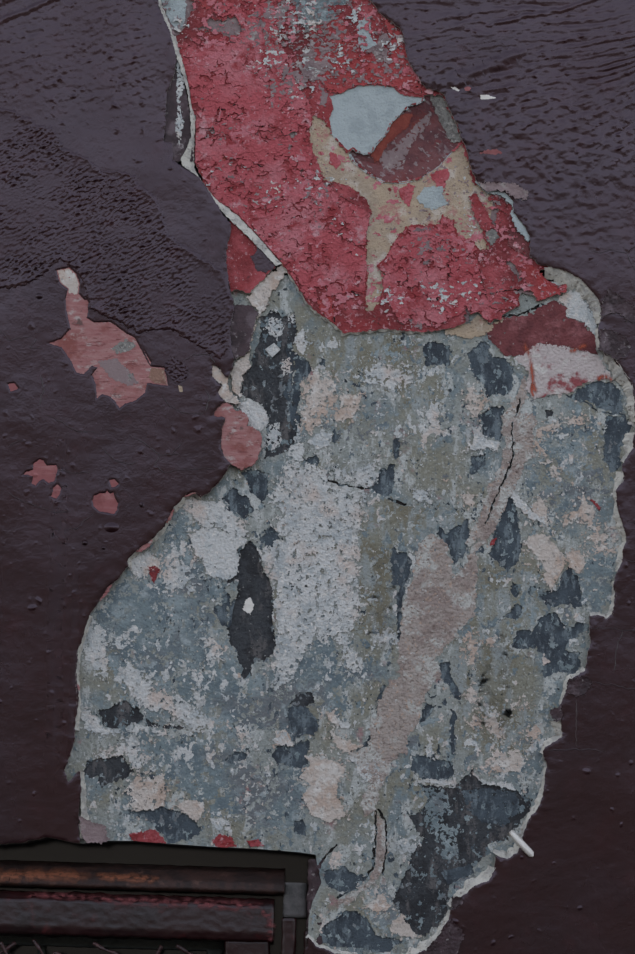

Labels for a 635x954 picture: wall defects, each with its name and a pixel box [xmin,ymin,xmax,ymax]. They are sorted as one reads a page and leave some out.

peeling [478,180,529,201]
peeling [50,268,183,408]
flaking render [263,341,282,359]
peeling [212,365,262,471]
peeling [24,459,61,498]
peeling [92,479,118,514]
crack [485,399,521,524]
spalling [227,541,276,679]
peeling [565,675,593,697]
peeling [79,816,110,844]
spalling [392,768,534,937]
peeling [418,919,465,954]